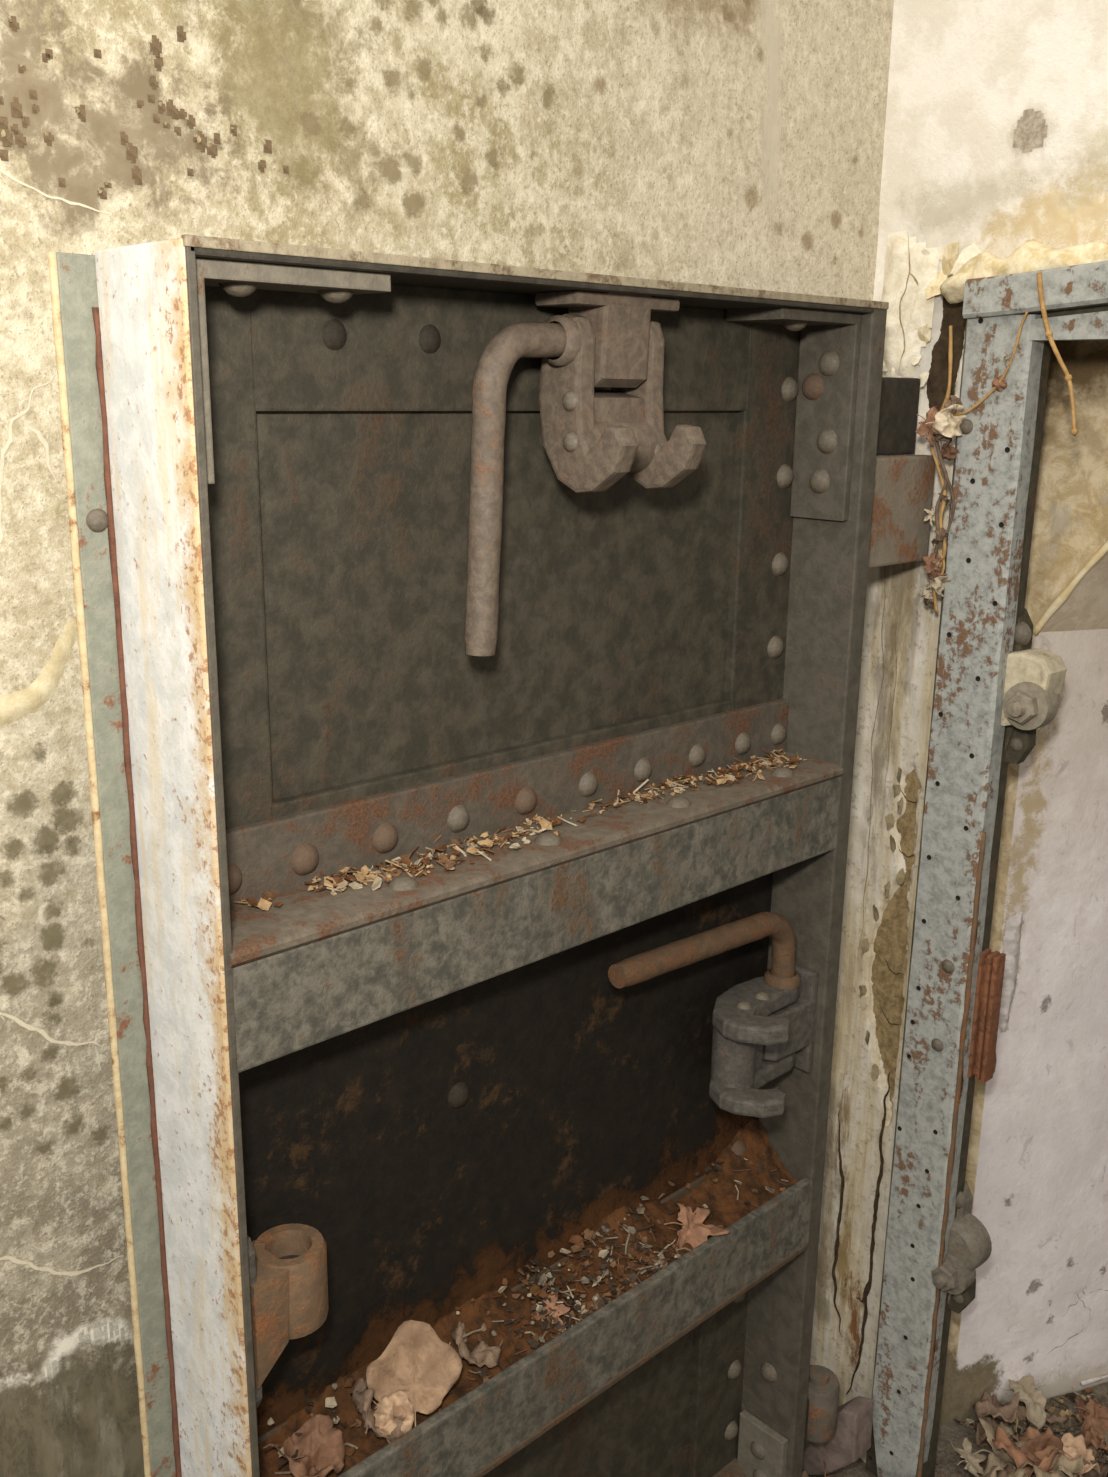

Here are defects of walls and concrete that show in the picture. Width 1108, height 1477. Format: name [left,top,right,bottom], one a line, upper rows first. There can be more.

leakage [0,0,214,225]
peeling [859,767,921,1104]
corrosion [938,832,1006,1267]
crack [832,1072,890,1395]
corrosion [917,1287,941,1477]